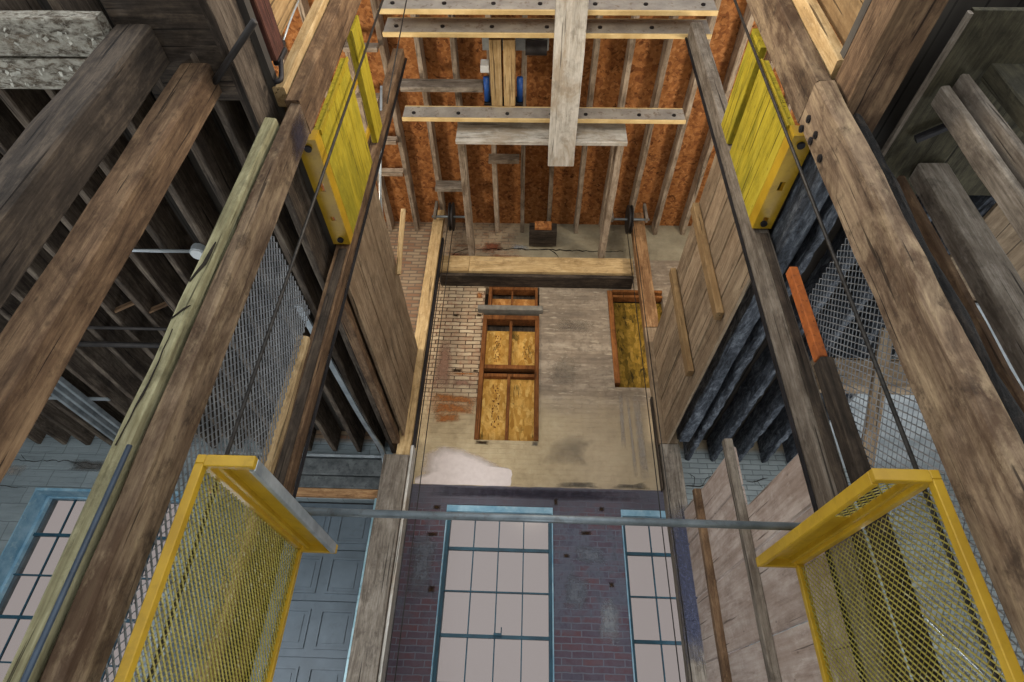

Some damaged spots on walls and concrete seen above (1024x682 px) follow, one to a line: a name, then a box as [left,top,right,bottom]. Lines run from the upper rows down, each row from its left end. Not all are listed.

crack [15,242,216,469]
peeling [436,349,478,385]